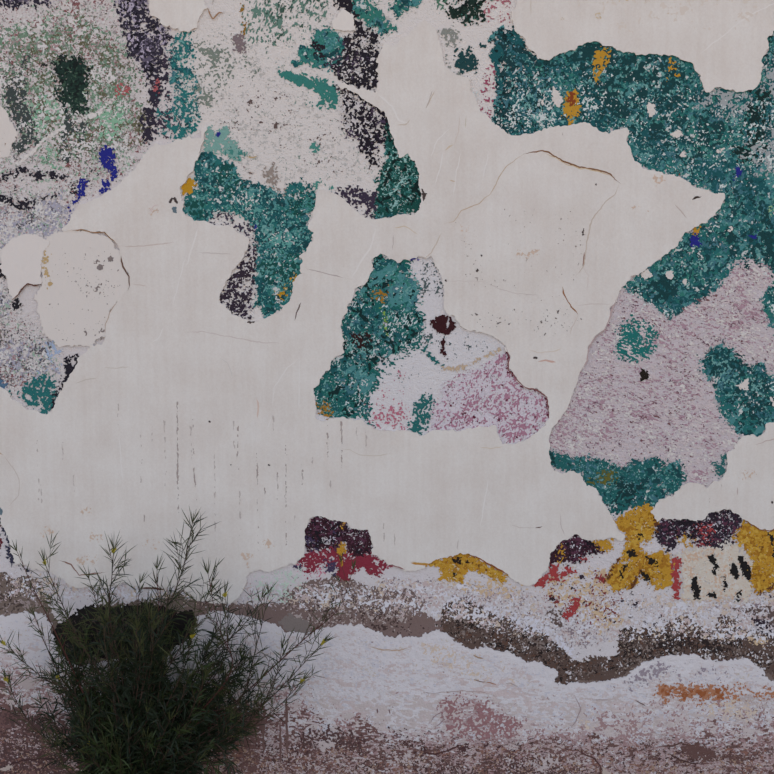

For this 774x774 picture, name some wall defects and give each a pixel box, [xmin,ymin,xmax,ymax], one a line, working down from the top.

peeling [0,0,774,520]
crack [545,153,617,272]
crack [531,290,611,363]
peeling [0,572,54,621]
peeling [196,577,774,685]
spalling [680,741,747,765]